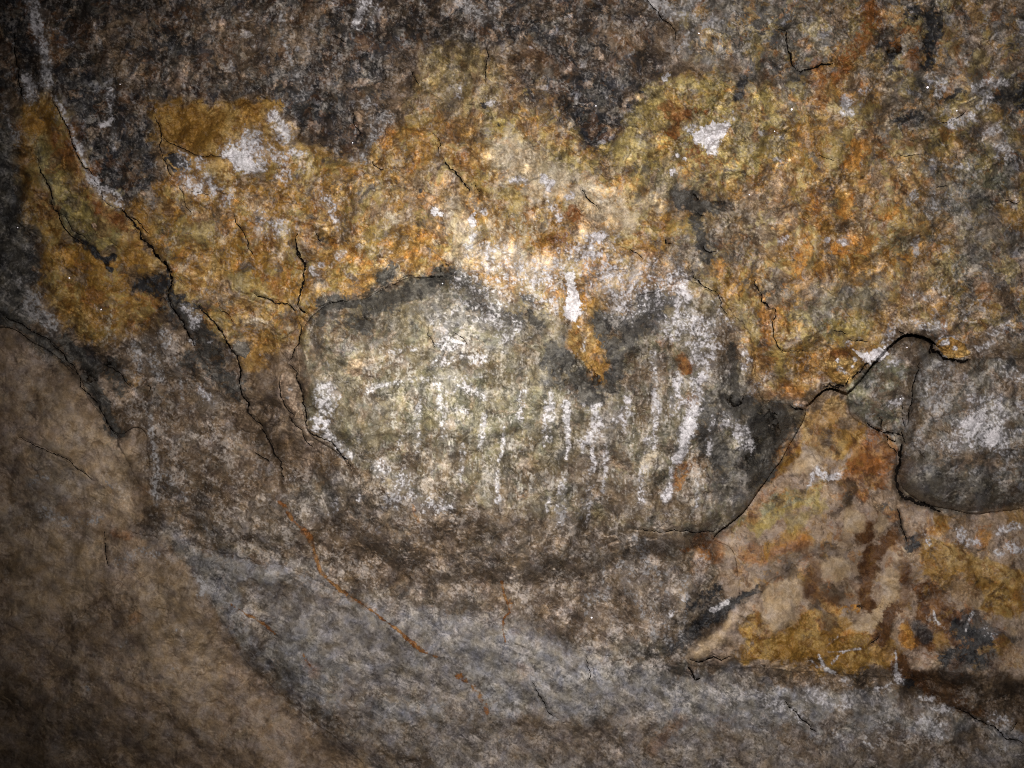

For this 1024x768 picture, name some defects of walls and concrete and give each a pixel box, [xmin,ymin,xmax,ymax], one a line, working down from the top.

crack [37,154,90,246]
crack [52,97,285,479]
crack [19,437,95,481]
crack [0,312,119,438]
crack [254,232,352,471]
damp [309,382,353,459]
damp [316,187,800,523]
crack [825,330,878,389]
crack [867,331,970,542]